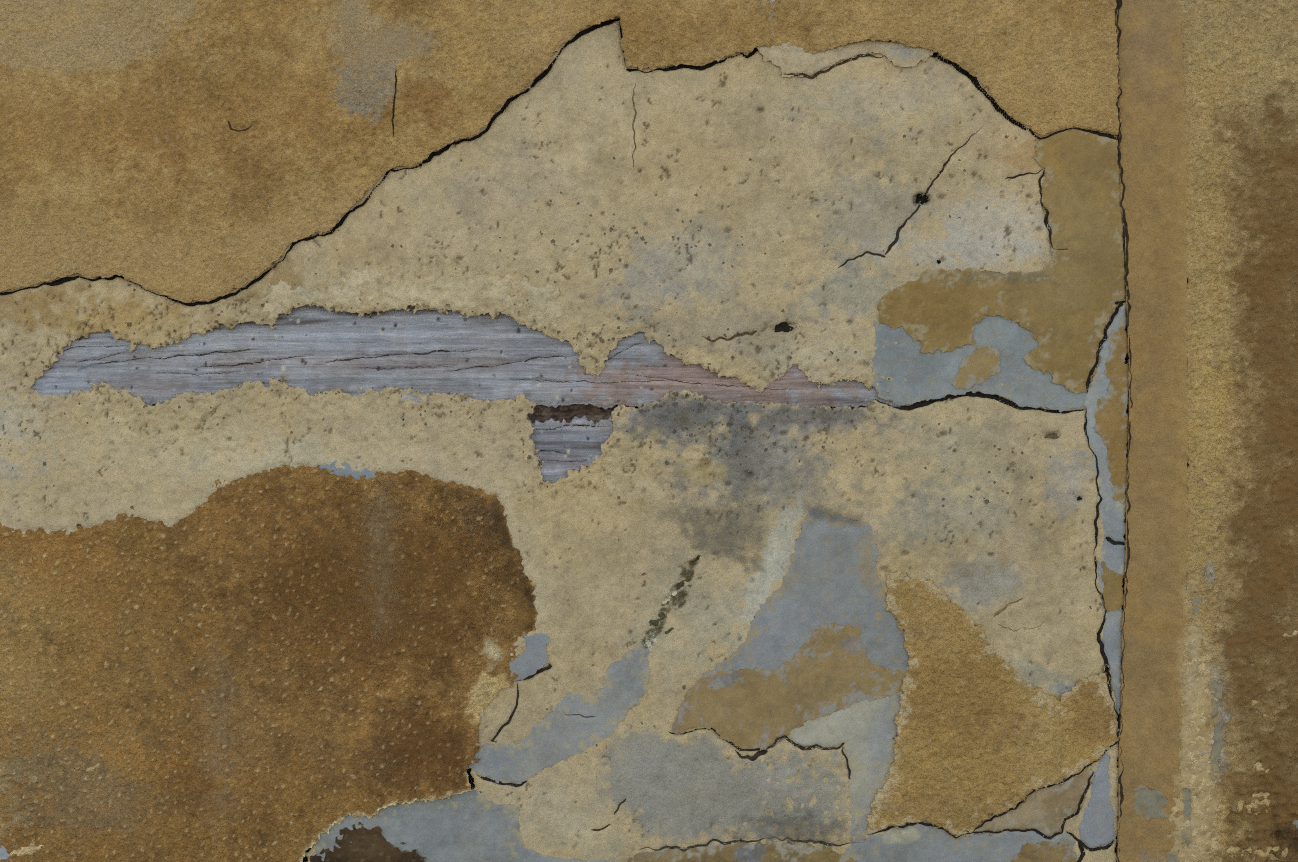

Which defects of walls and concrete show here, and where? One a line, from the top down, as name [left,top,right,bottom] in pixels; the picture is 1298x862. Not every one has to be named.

crack [390,72,398,137]
crack [630,84,638,167]
peeling [871,315,1087,413]
peeling [319,460,377,480]
crack [642,0,1133,862]
peeling [1085,297,1129,715]
peeling [509,633,550,681]
peeling [672,508,910,759]
peeling [468,642,651,784]
spalling [591,690,1118,862]
peeling [305,790,619,862]